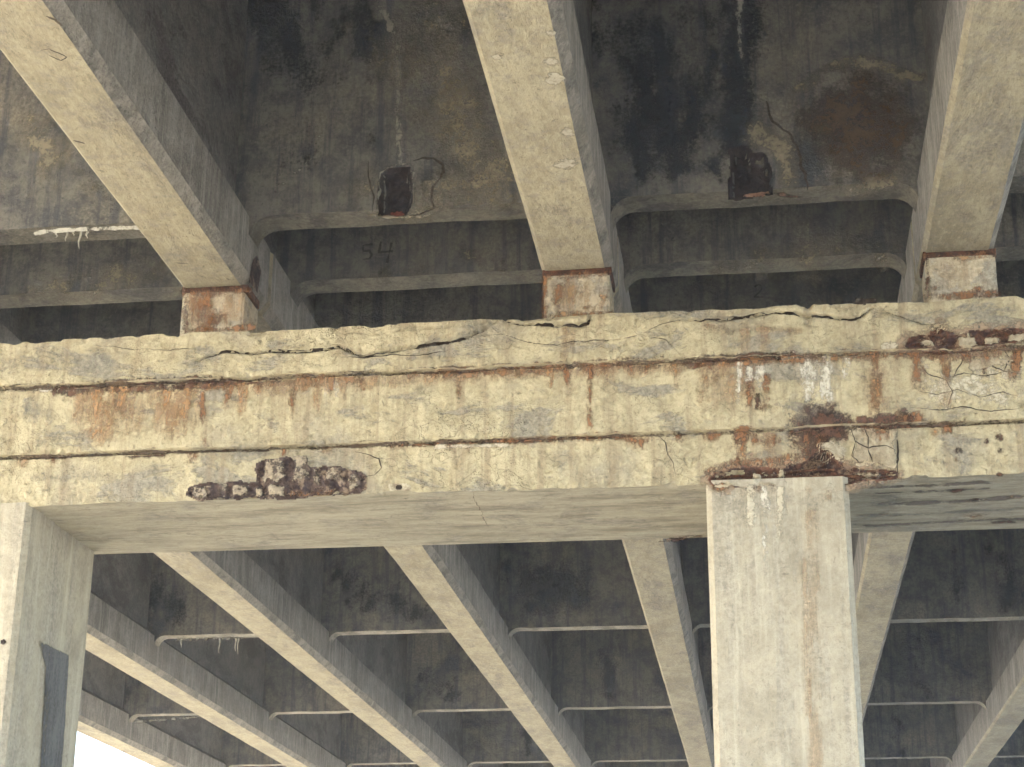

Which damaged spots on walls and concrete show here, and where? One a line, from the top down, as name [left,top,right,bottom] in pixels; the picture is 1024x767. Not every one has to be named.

leakage [591,0,768,188]
spalling [728,101,809,201]
spalling [370,163,415,219]
crack [410,157,445,216]
leakage [34,225,139,249]
corrosion [925,256,1000,300]
corrosion [51,374,396,441]
crack [94,310,870,358]
corrosion [390,328,954,465]
spalling [881,319,1024,409]
crack [912,349,1024,412]
spalling [186,455,367,502]